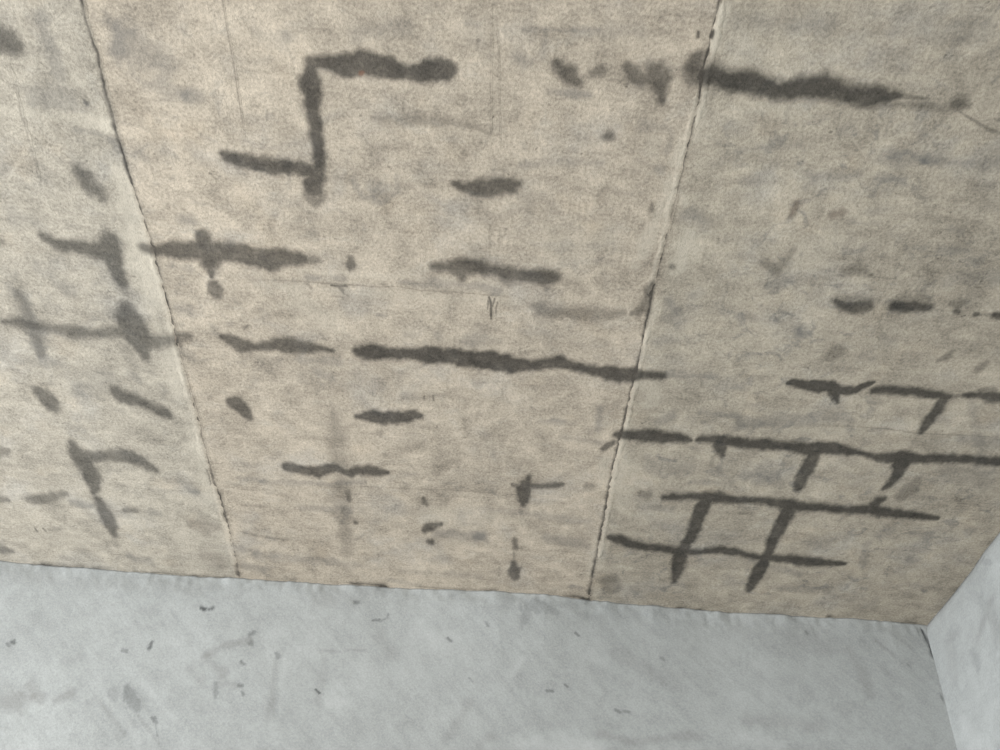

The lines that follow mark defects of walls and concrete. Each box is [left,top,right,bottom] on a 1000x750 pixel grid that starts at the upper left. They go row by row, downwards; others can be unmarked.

damp [216,45,494,210]
damp [547,45,1000,136]
crack [28,0,294,578]
damp [0,222,325,424]
damp [216,329,670,387]
crack [561,0,726,601]
damp [63,436,162,551]
damp [598,376,1000,595]
crack [345,579,498,591]
crack [672,603,705,611]
crack [765,608,787,616]
crack [822,611,836,619]